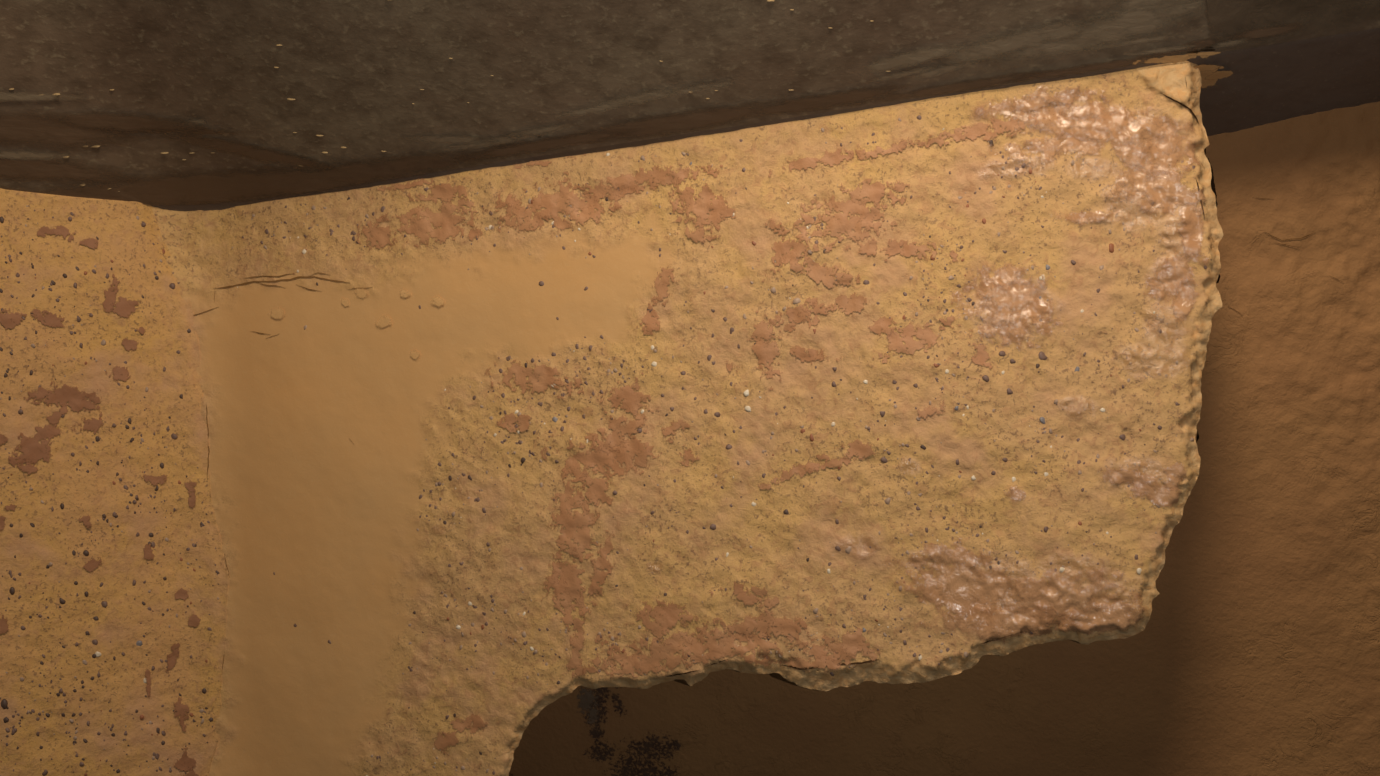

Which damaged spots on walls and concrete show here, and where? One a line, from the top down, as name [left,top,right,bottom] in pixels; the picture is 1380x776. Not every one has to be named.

spalling [251,197,385,274]
spalling [903,234,989,421]
spalling [949,139,1047,208]
spalling [416,335,644,552]
spalling [1027,399,1105,492]
spalling [766,459,1112,691]
peeling [408,587,685,776]